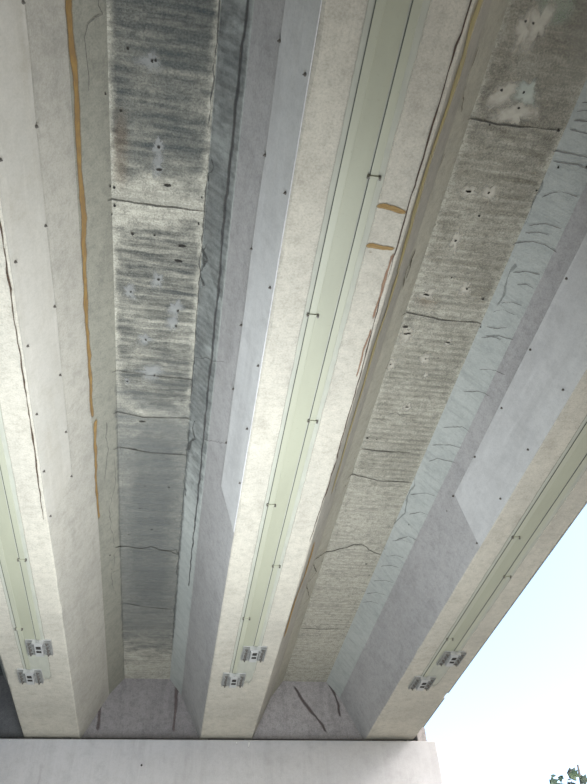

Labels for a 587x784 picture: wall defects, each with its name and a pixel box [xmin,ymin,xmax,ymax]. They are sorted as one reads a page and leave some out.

crack [0,222,44,520]
corrosion [65,0,100,518]
crack [105,422,178,593]
damp [112,0,249,648]
crack [310,297,381,539]
crack [307,537,416,604]
corrosion [332,0,483,491]
crack [388,0,472,277]
crack [482,271,539,340]
crack [513,223,558,252]
crack [553,150,587,169]